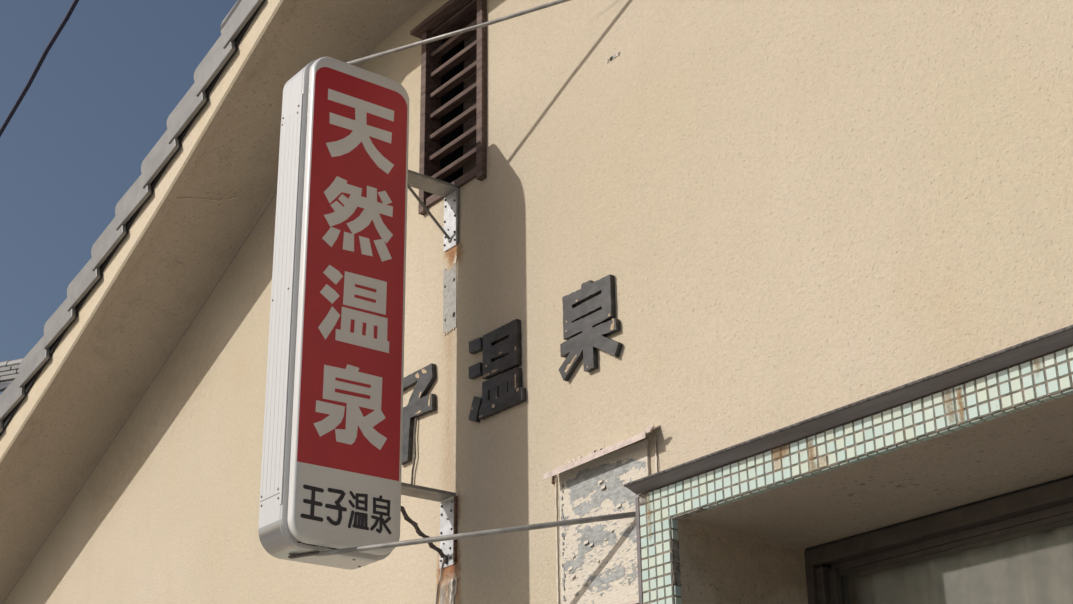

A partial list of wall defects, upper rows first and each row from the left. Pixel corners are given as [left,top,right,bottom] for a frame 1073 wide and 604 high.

peeling [561,458,647,604]